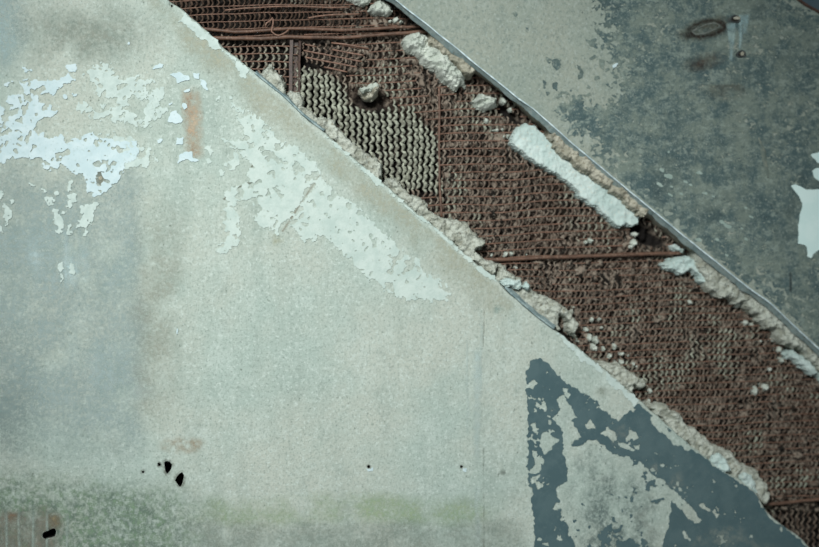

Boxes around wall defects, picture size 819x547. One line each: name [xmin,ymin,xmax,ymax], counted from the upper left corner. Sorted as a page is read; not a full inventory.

corrosion [685,20,726,38]
damp [727,15,749,60]
peeling [0,62,187,236]
peeling [58,260,75,282]
spalling [170,0,819,547]